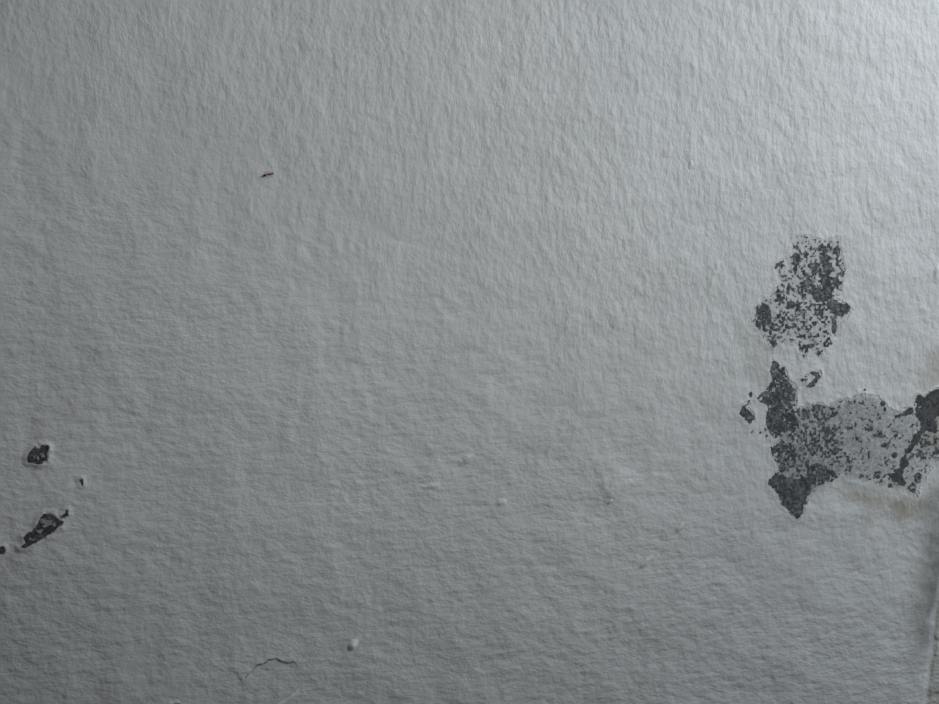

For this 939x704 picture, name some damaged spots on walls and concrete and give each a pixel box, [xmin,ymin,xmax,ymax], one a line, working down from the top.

peeling [734,229,939,526]
peeling [21,439,55,470]
peeling [0,503,75,560]